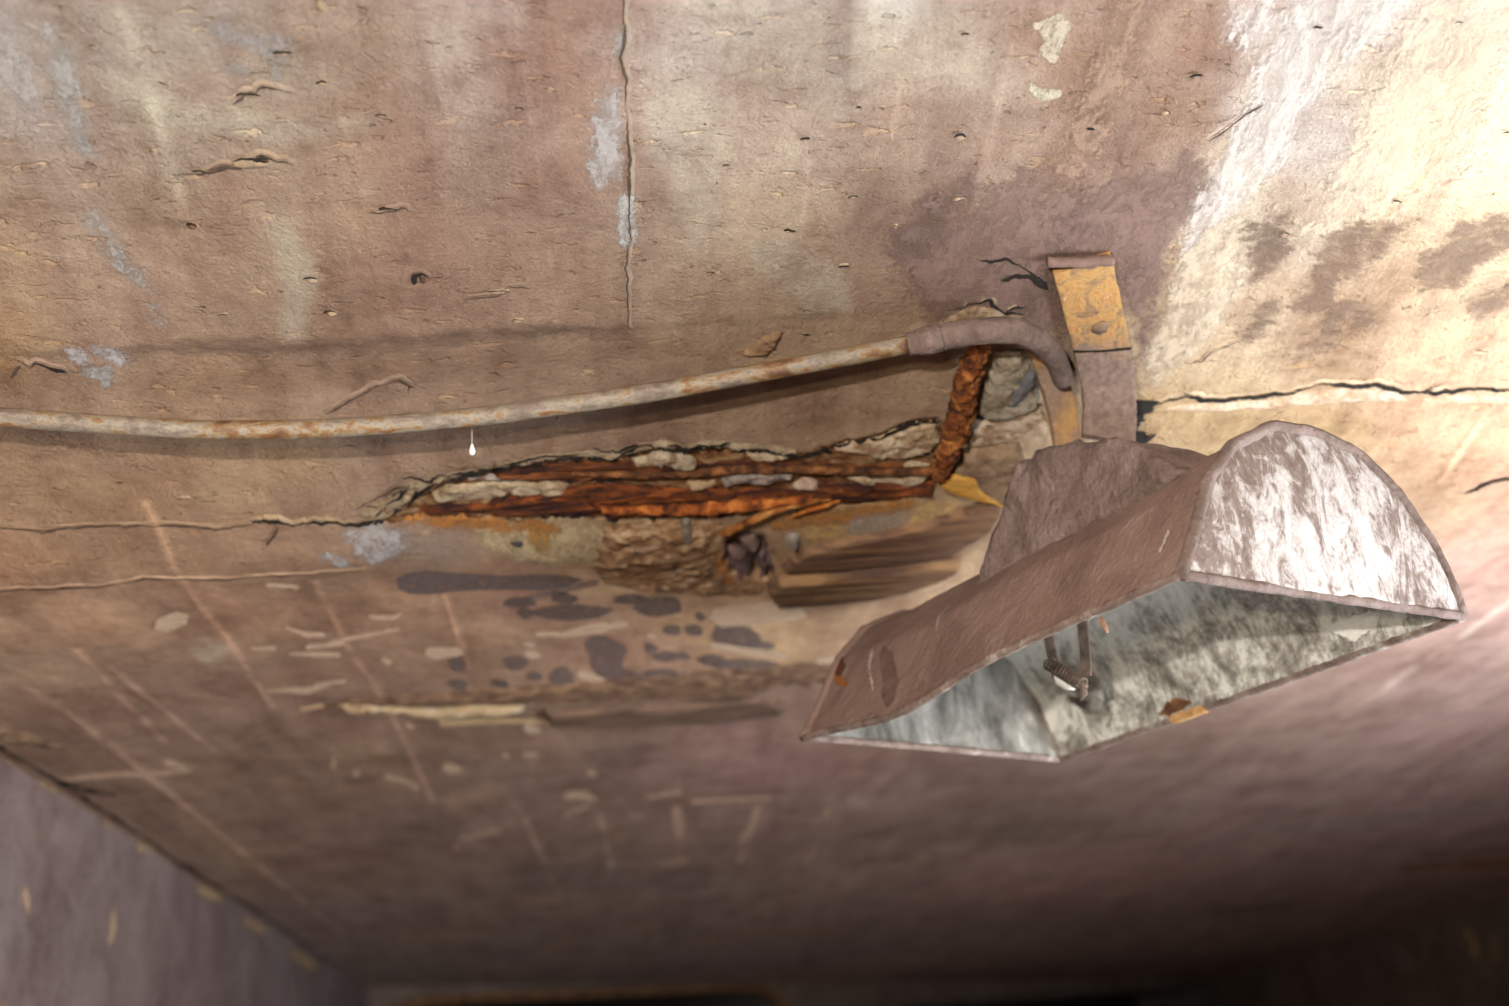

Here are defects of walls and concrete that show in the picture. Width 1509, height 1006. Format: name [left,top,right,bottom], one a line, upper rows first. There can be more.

crack [619,0,636,329]
leakage [1144,0,1410,384]
leakage [1418,215,1509,322]
rust [572,344,992,483]
crack [1136,337,1509,443]
flaking render [153,611,190,633]
crack [0,485,427,592]
rust [405,512,561,556]
leakage [397,517,778,680]
spalling [250,416,945,734]
rust [601,494,918,532]
flaking render [564,770,598,802]